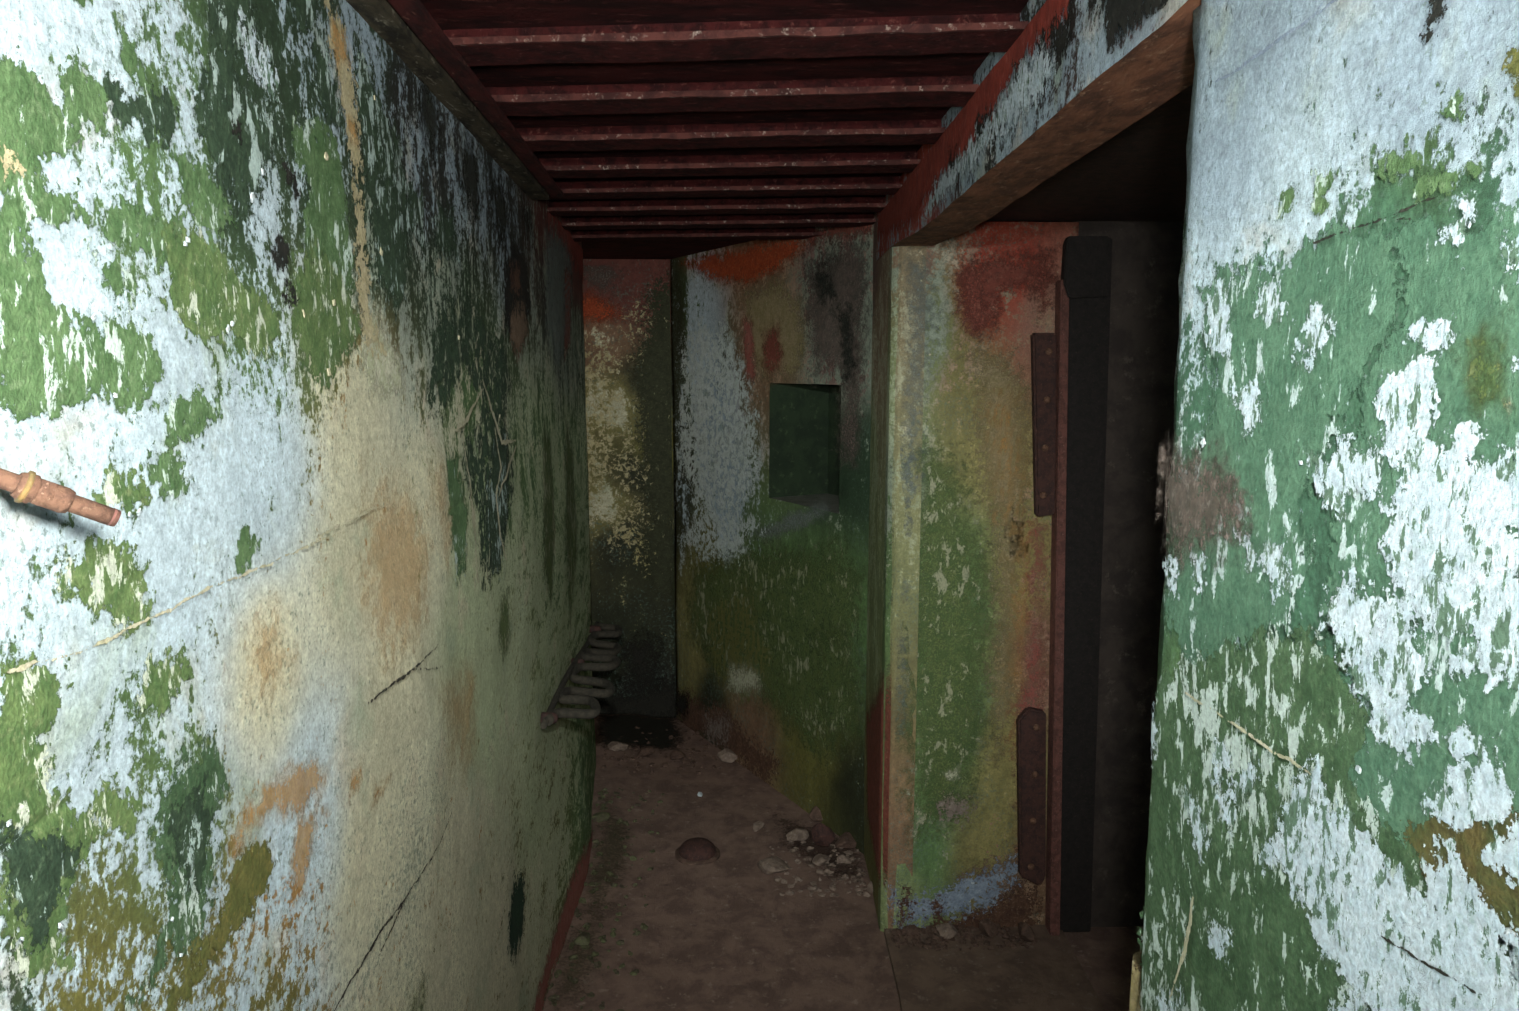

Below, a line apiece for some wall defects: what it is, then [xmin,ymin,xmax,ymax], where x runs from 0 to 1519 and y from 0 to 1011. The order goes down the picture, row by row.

damp [324,0,573,400]
peeling [878,0,1069,237]
peeling [1419,0,1449,44]
peeling [1438,87,1469,126]
peeling [1501,46,1519,100]
peeling [0,0,412,731]
crack [7,505,394,674]
damp [443,424,510,660]
damp [542,419,578,625]
peeling [1129,133,1519,1011]
peeling [0,648,282,1011]
spalling [884,840,1043,929]